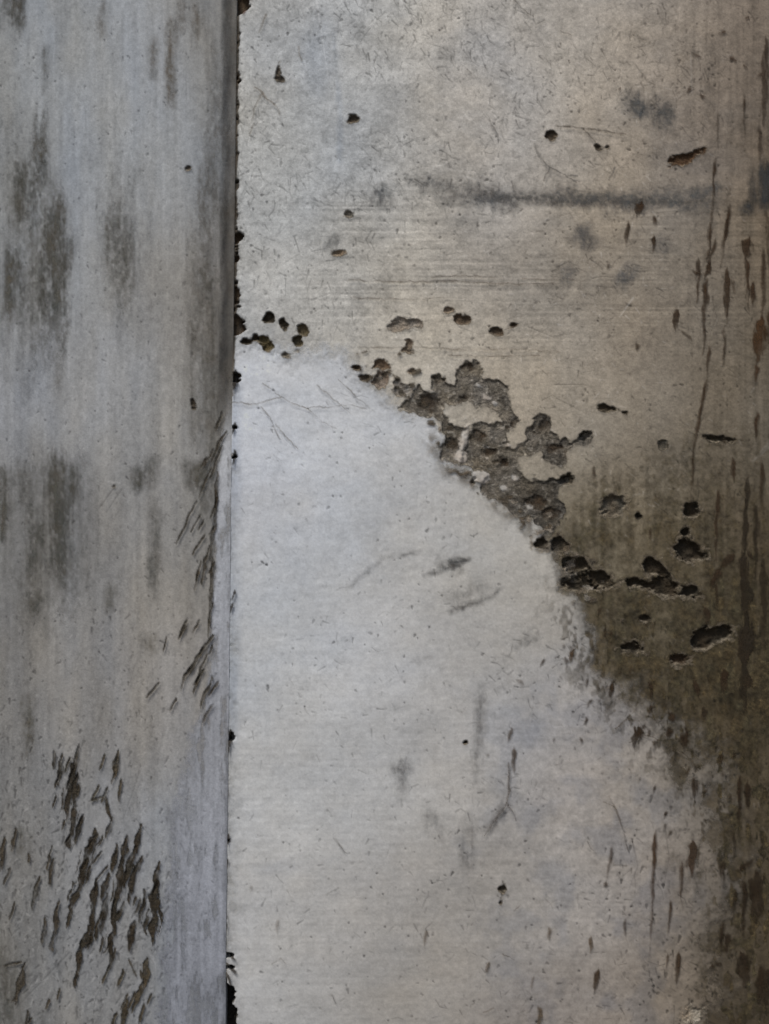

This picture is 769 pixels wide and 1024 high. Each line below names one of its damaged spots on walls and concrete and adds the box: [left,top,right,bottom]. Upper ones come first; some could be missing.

spalling [668,147,707,168]
rust [694,208,730,334]
rust [741,237,769,302]
rust [752,313,769,377]
spalling [351,317,702,603]
spalling [702,435,737,444]
spalling [670,502,710,565]
rust [711,459,767,710]
spalling [670,623,737,669]
rust [631,726,655,745]
damp [585,514,769,1024]
peeling [31,745,163,1024]